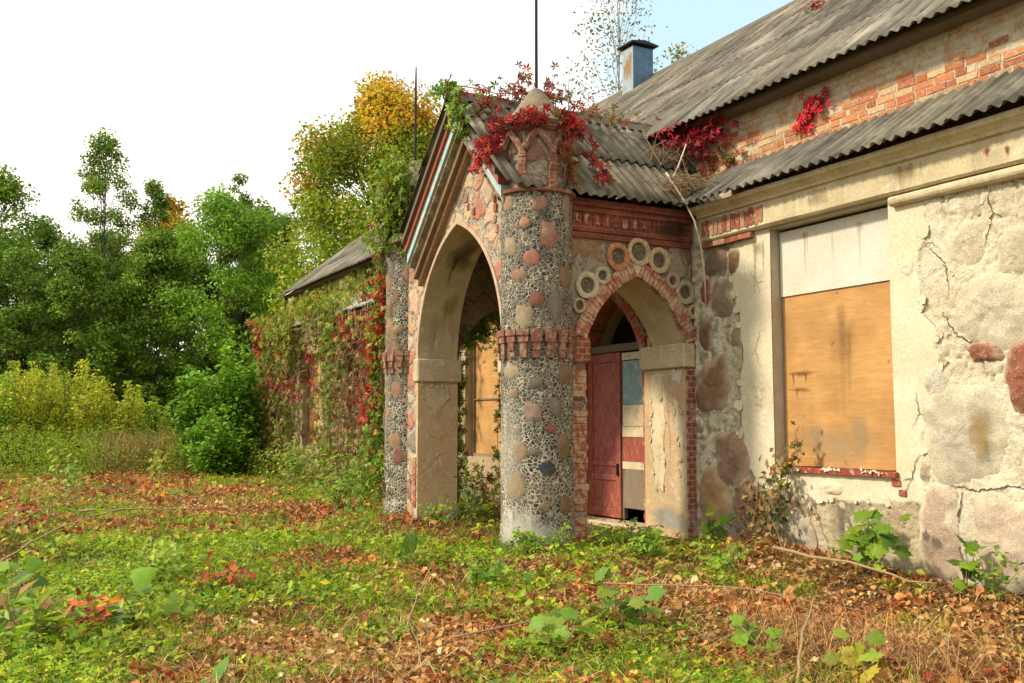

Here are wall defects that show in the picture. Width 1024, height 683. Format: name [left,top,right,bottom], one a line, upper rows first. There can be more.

crack [971,187,1002,247]
crack [919,242,978,343]
spalling [648,178,1024,596]